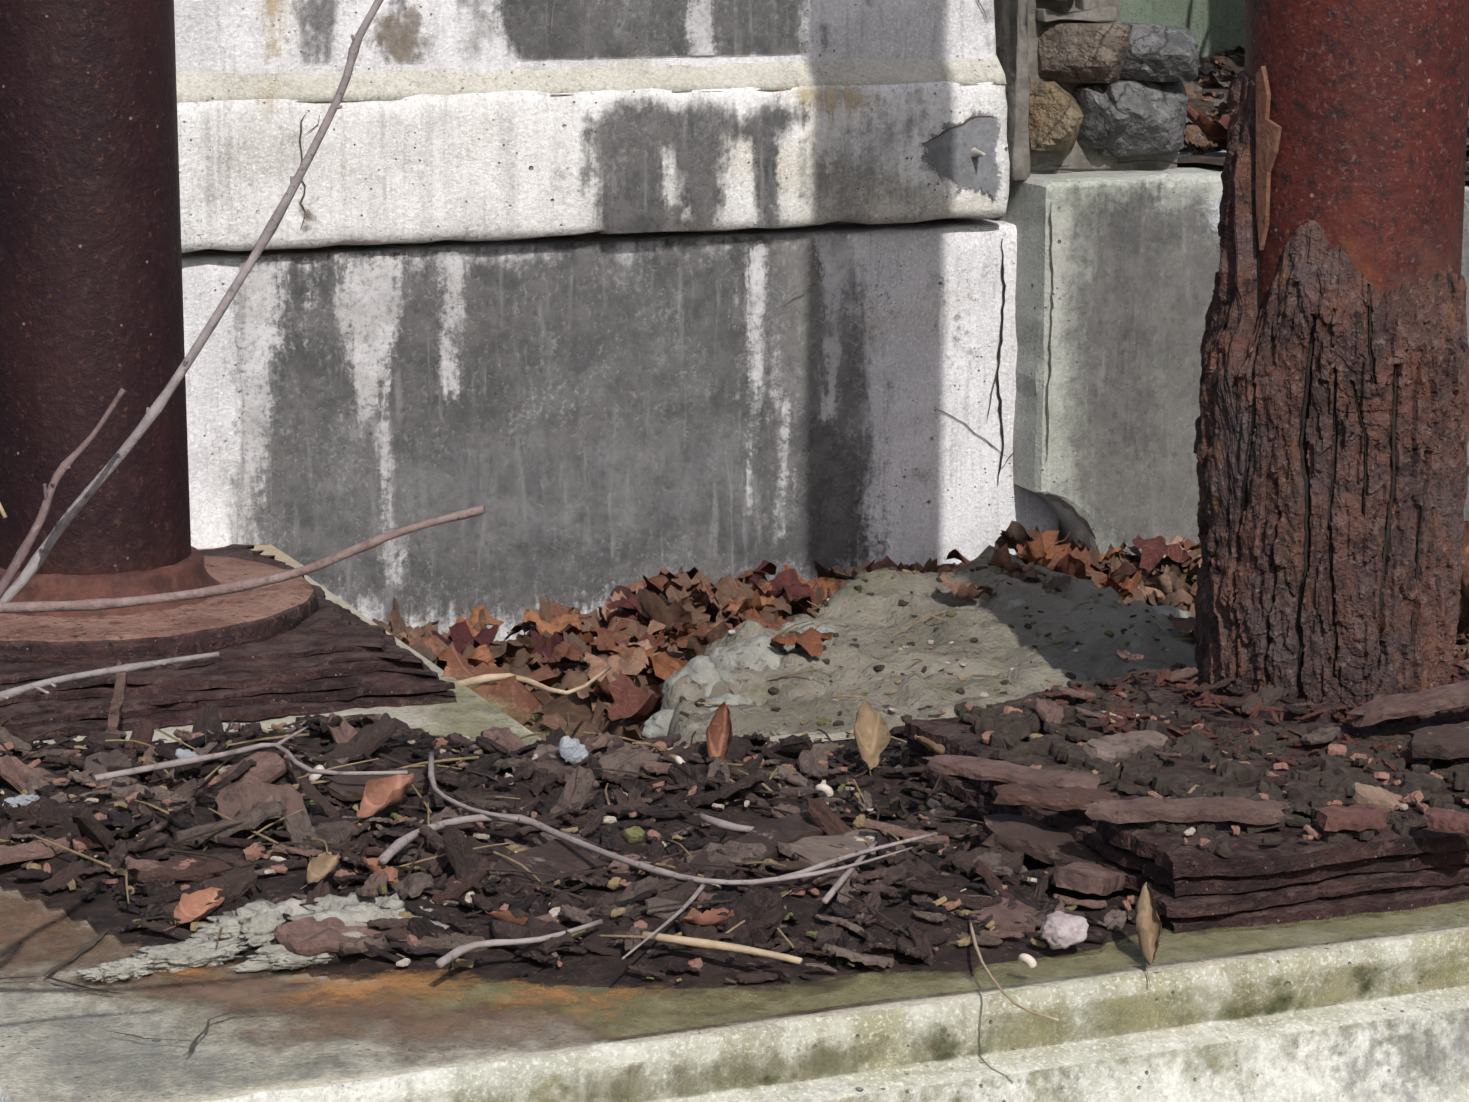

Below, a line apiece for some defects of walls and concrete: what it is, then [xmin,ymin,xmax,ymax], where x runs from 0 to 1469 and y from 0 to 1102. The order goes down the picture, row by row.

water stain [294,0,338,63]
water stain [367,0,425,62]
water stain [460,0,808,59]
crack [299,112,320,229]
spalling [918,109,1002,200]
water stain [231,85,886,627]
crack [935,202,1054,481]
water stain [1067,183,1220,554]